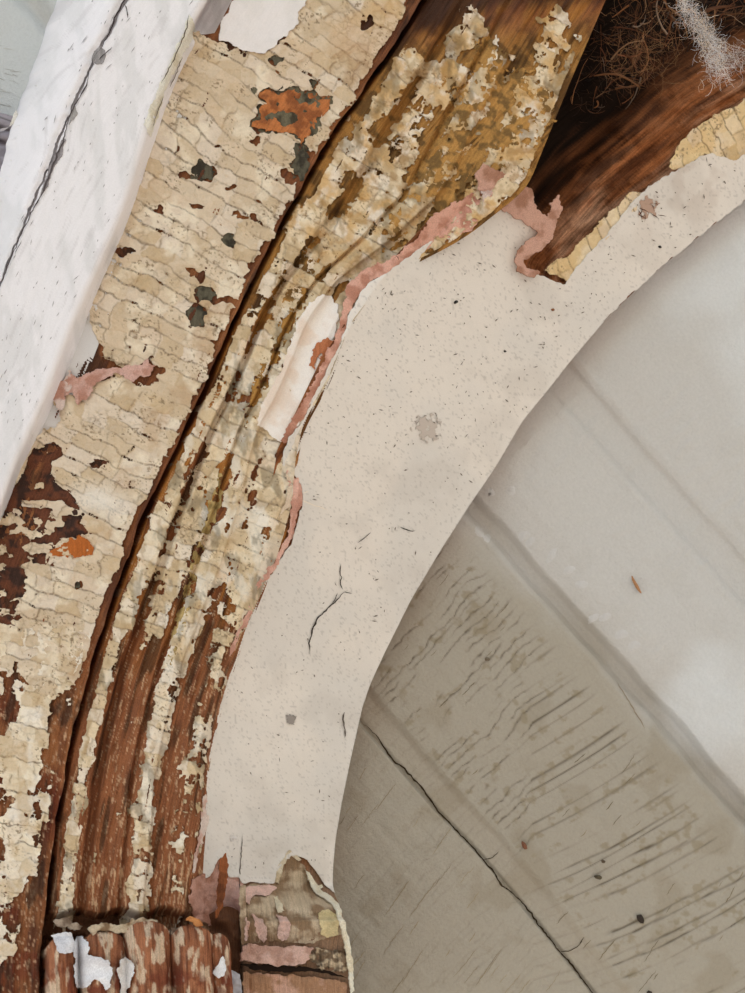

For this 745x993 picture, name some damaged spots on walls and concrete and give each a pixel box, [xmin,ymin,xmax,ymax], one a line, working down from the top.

crack [0,0,193,439]
peeling [545,192,641,281]
peeling [669,99,745,170]
peeling [0,0,582,993]
crack [308,566,352,650]
crack [240,712,616,993]